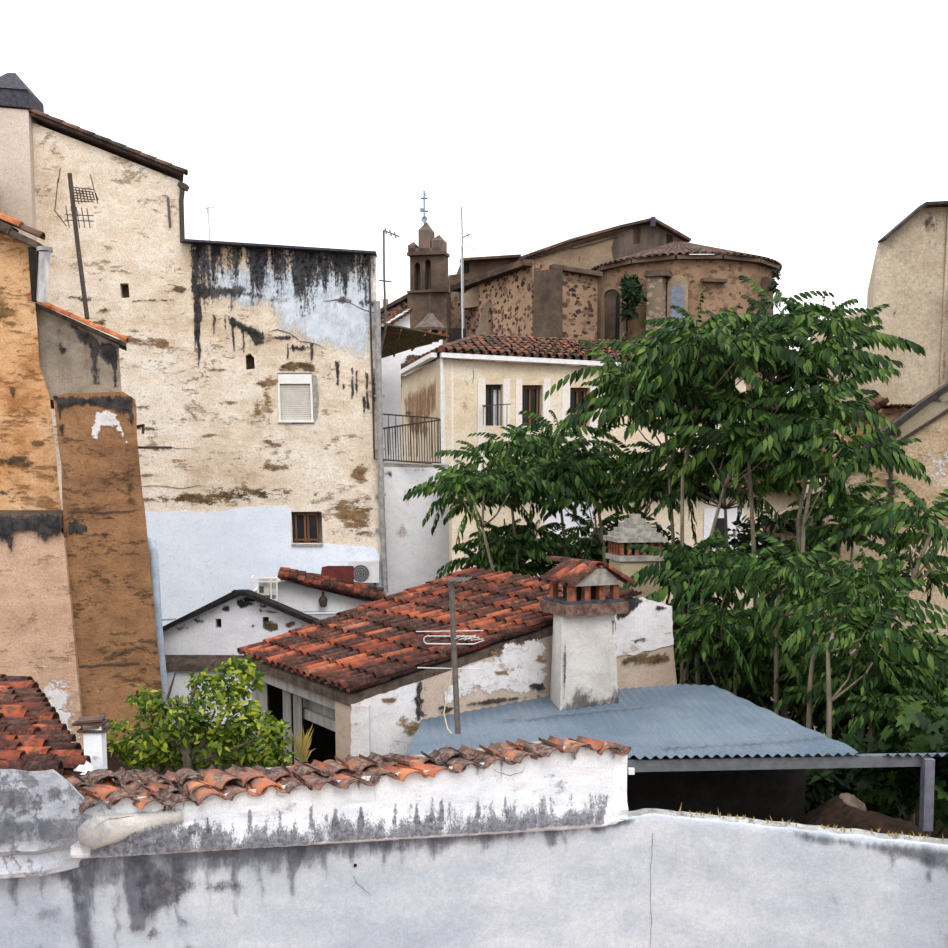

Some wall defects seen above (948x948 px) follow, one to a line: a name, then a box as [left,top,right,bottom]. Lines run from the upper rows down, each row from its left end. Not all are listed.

leakage [189,244,375,365]
leakage [53,324,134,436]
peeling [91,410,128,443]
peeling [923,446,948,482]
peeling [442,639,548,706]
leakage [591,819,634,831]
leakage [60,830,559,948]